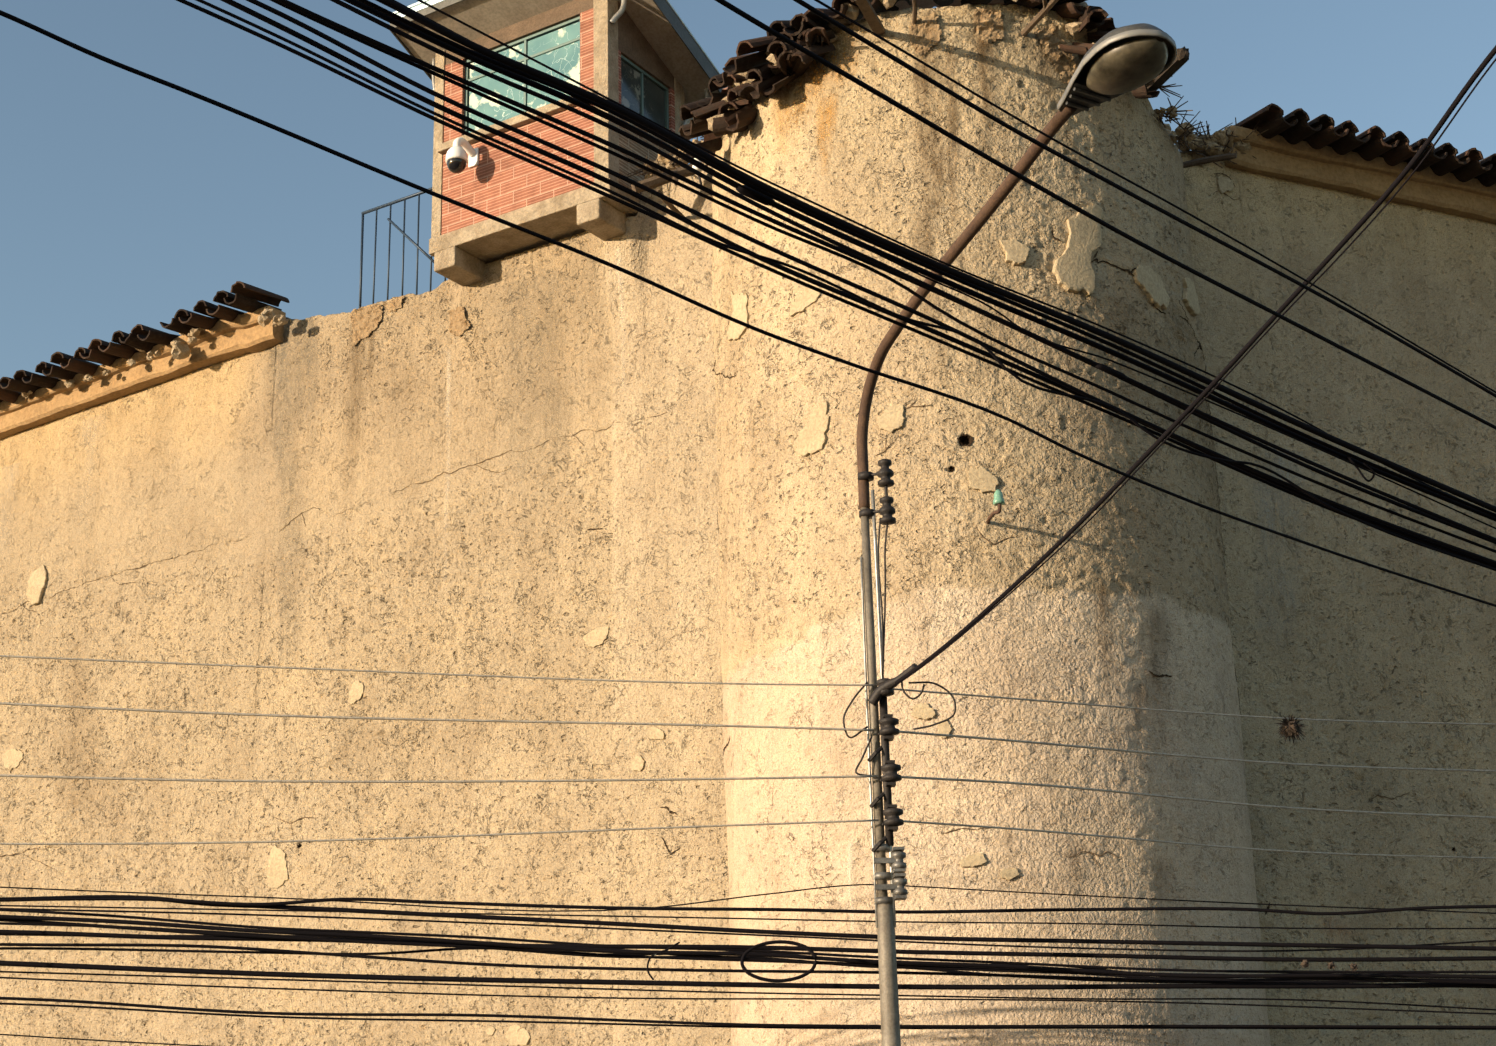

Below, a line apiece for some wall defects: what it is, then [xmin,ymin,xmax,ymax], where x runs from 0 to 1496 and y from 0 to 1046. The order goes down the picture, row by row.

flaking render [999,238,1030,266]
flaking render [1052,204,1103,296]
flaking render [1133,264,1200,316]
crack [395,412,666,492]
flaking render [26,565,48,606]
crack [8,540,239,614]